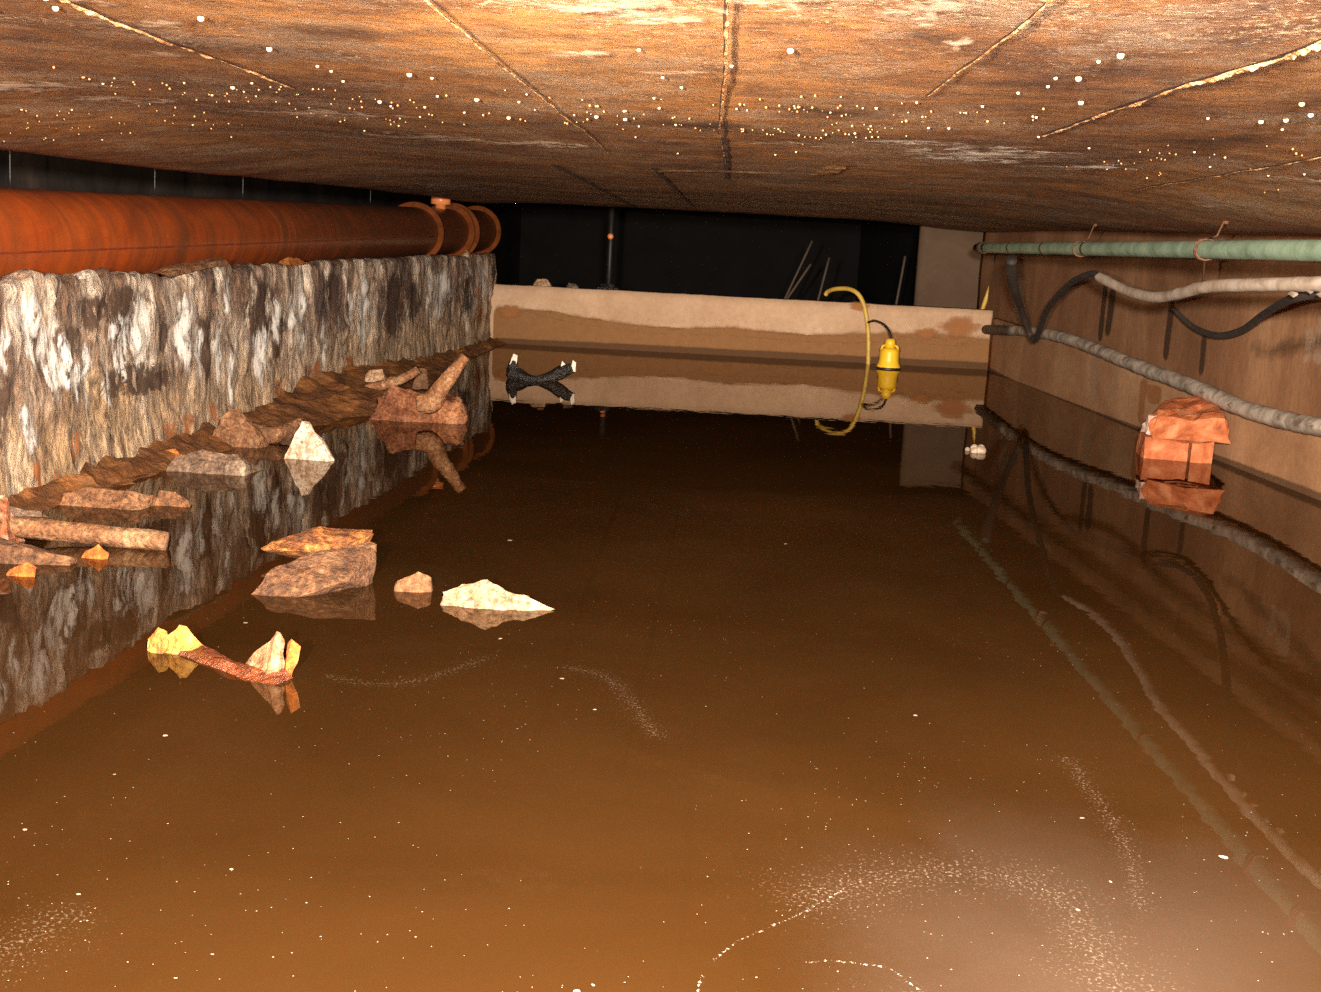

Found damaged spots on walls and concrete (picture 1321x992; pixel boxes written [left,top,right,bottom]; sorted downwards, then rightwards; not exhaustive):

crack [59,0,294,89]
crack [423,0,610,154]
crack [651,0,853,208]
crack [927,0,1055,97]
crack [1041,38,1321,137]
rust [278,257,308,265]
damp [476,264,1141,430]
rust [1138,380,1160,421]
damp [1212,454,1321,501]